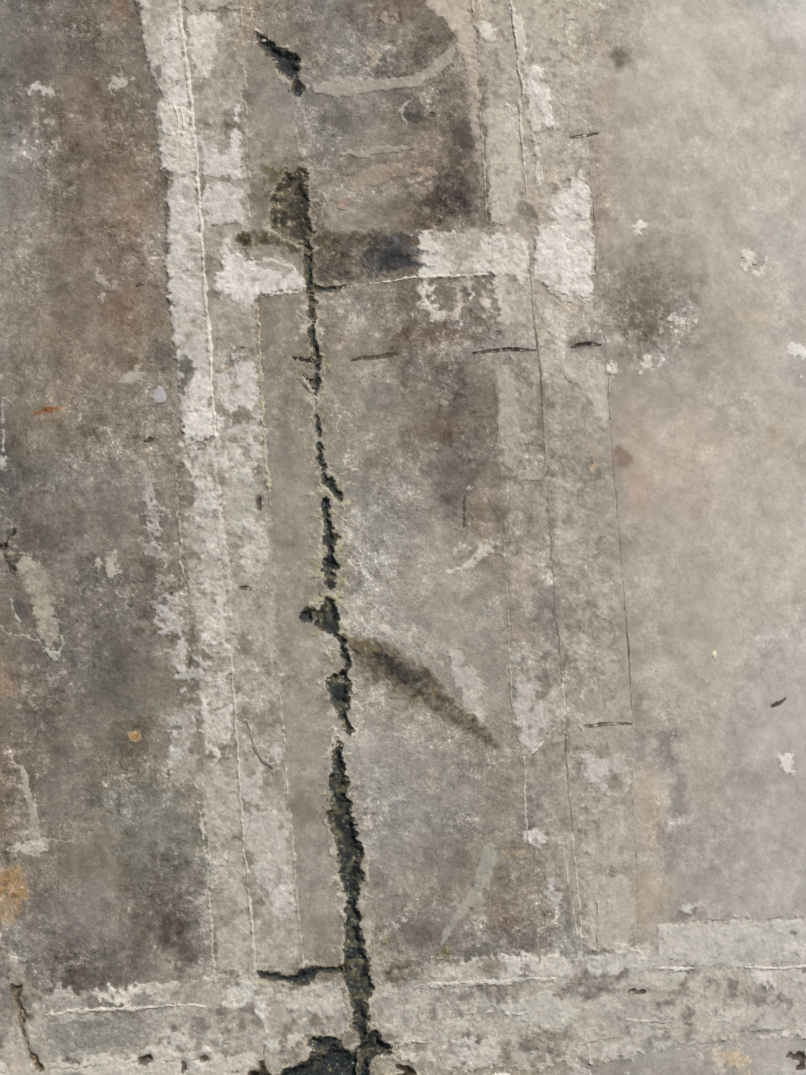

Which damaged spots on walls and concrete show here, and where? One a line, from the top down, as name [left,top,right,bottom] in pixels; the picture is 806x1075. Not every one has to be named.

crack [241,16,311,151]
water stain [393,138,480,185]
water stain [360,227,447,275]
crack [253,220,464,1075]
water stain [350,630,505,754]